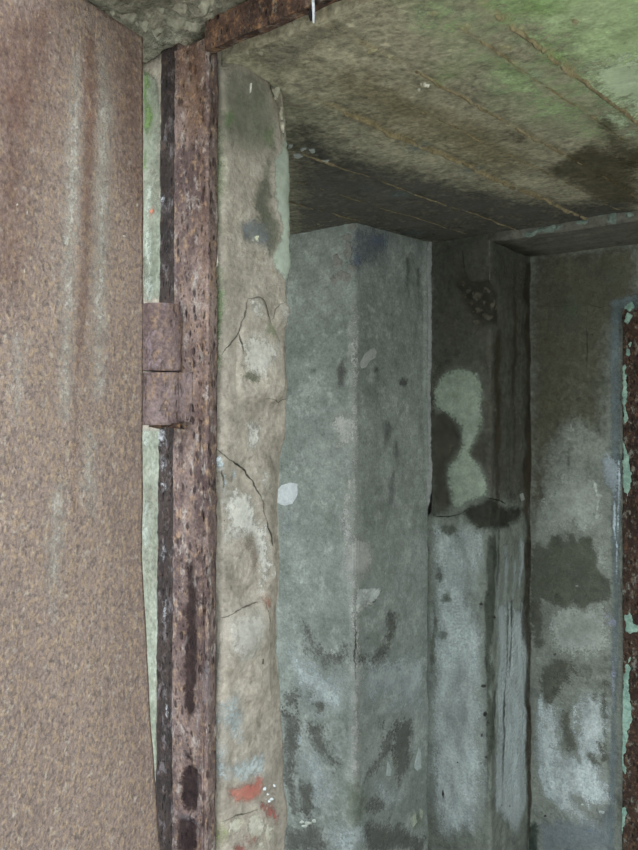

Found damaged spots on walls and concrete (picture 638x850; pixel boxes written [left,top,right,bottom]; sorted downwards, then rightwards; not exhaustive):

crack [218,450,273,546]
crack [224,296,278,354]
leakage [281,122,638,850]
peeling [603,294,638,850]